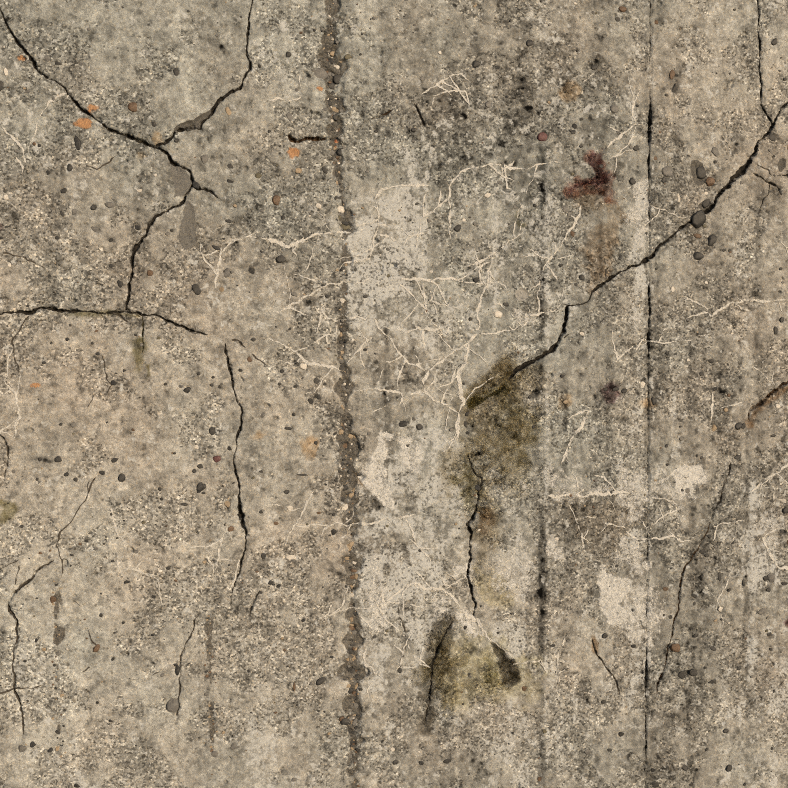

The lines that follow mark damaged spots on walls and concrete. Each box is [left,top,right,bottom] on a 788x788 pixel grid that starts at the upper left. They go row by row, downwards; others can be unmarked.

crack [0,0,253,368]
crack [471,0,788,405]
efflorescence [622,179,649,249]
crack [0,477,96,735]
crack [224,339,266,602]
crack [425,621,453,719]
leakage [432,594,484,638]
leakage [452,563,473,578]
crack [466,455,482,616]
crack [656,463,731,692]
crack [748,381,788,420]